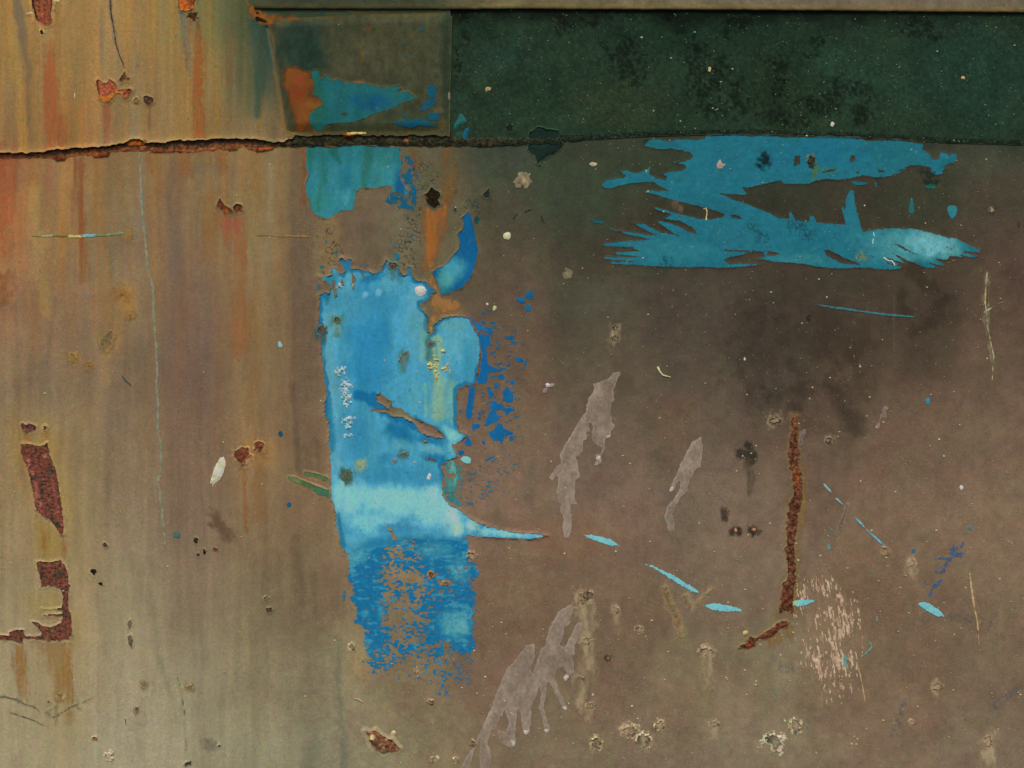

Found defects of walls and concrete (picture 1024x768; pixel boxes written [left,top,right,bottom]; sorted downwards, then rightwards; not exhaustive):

spalling [805,152,817,169]
rust [421,173,460,360]
peeling [302,69,552,696]
rust [17,420,67,537]
rust [234,441,264,464]
rust [735,410,806,653]
rust [0,557,75,688]